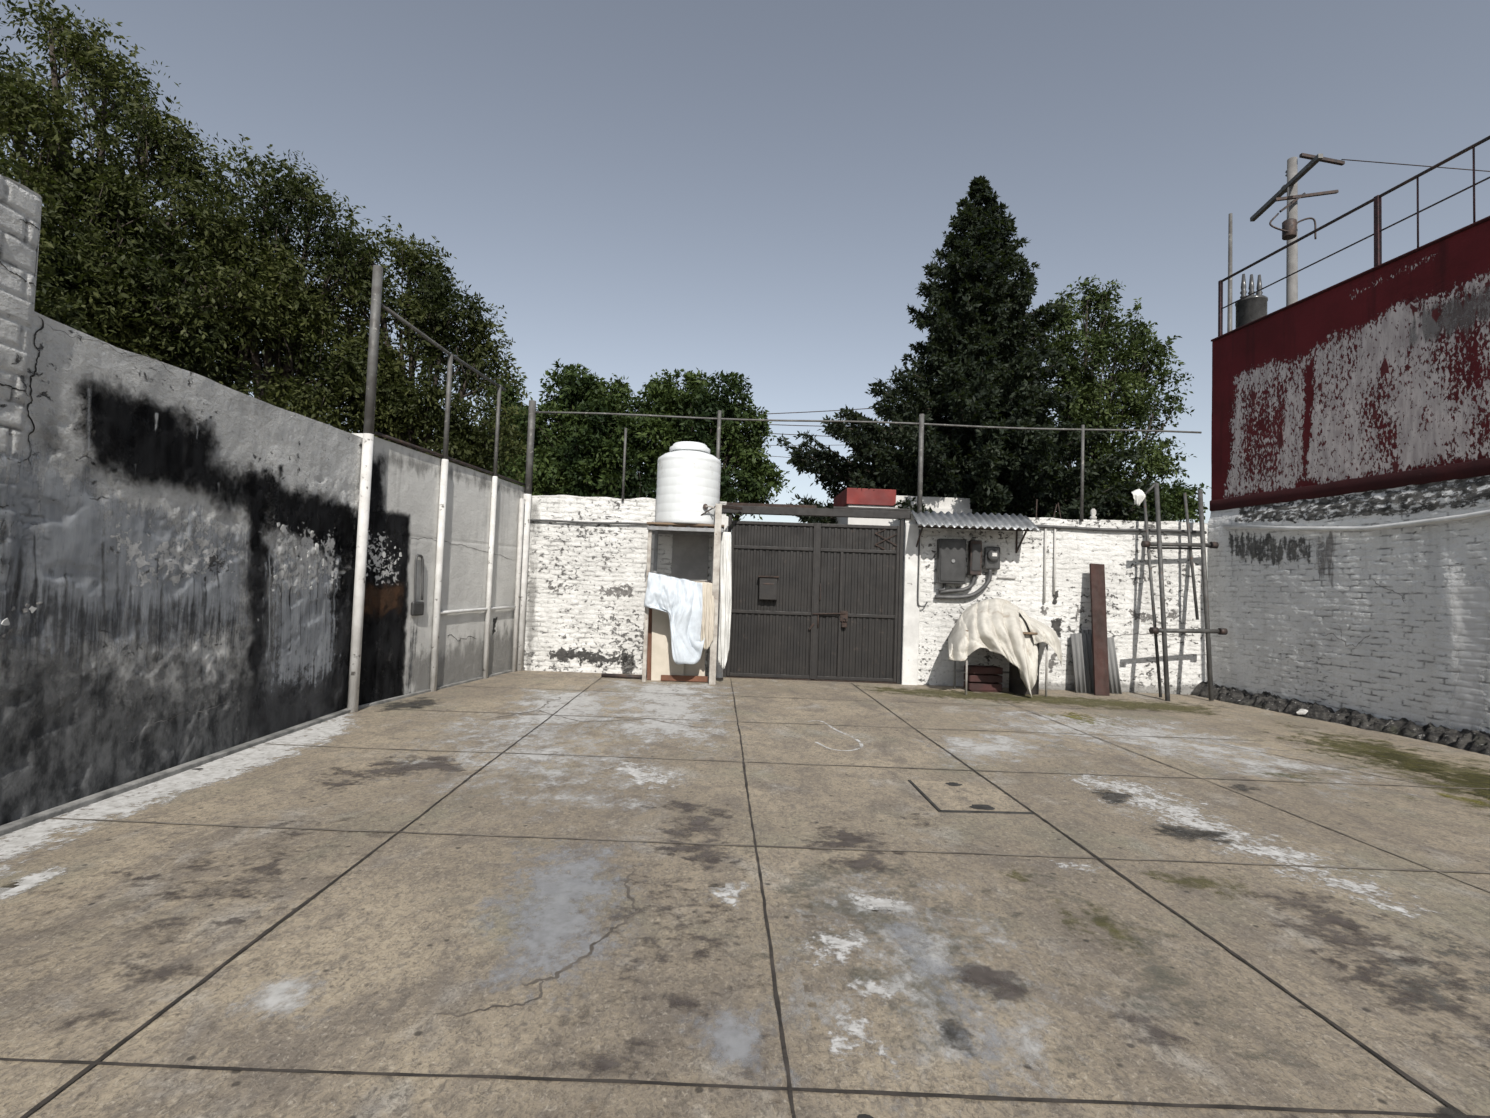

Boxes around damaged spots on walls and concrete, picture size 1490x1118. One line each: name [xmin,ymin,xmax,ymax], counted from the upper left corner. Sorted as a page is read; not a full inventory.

crack [0,261,174,620]
peeling [1223,272,1490,497]
water stain [0,414,341,685]
water stain [379,584,535,712]
peeling [548,520,636,674]
water stain [0,713,359,899]
water stain [323,681,738,869]
water stain [122,962,193,982]
water stain [256,980,310,1011]
crack [431,871,640,1017]
water stain [485,849,748,981]
water stain [669,997,765,1076]